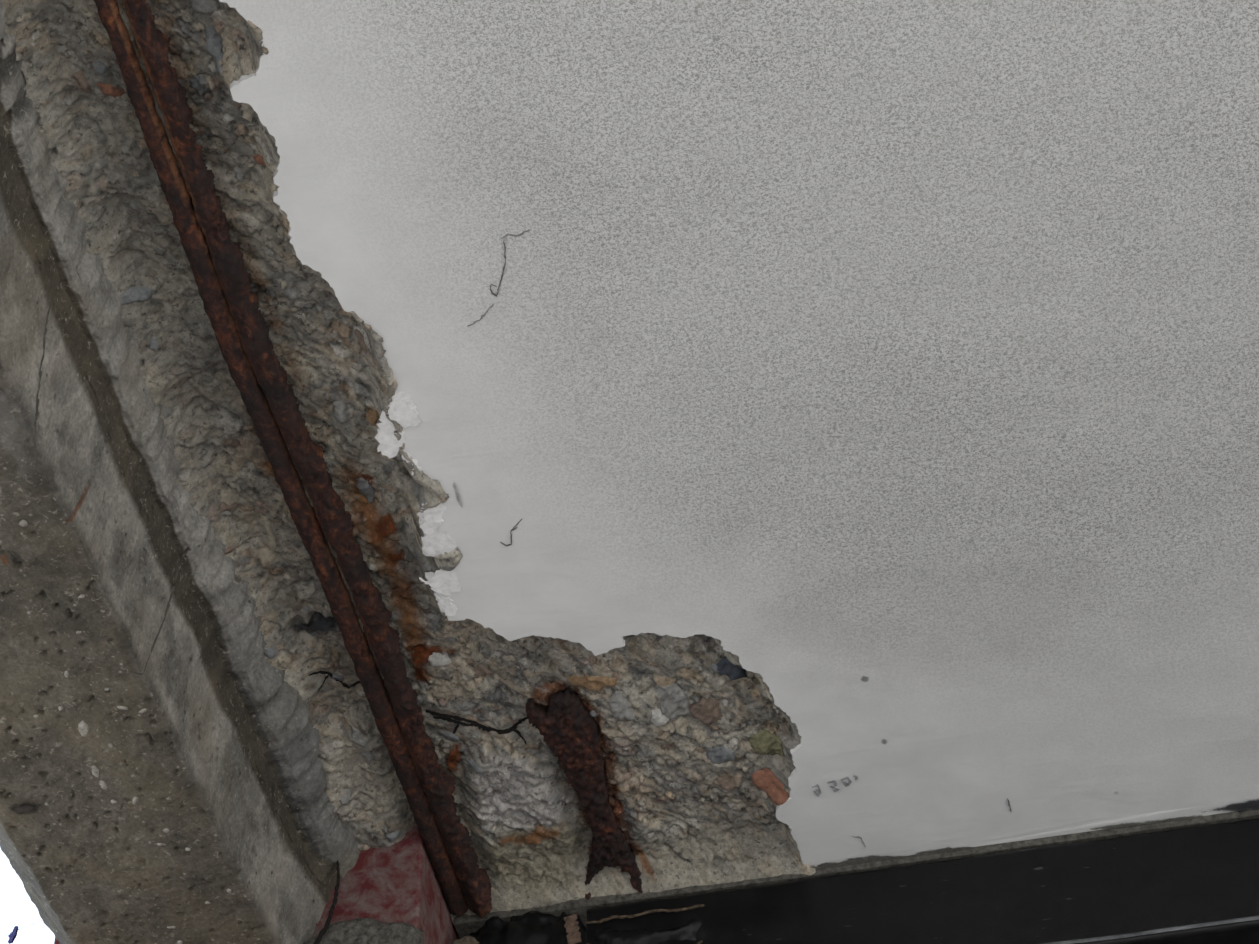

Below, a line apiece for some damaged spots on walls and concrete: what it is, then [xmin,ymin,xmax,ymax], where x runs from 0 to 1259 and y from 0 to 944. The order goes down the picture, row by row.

spalling [2,0,415,851]
corrosion [94,0,493,919]
crack [426,710,528,744]
spalling [145,0,975,925]
corrosion [526,680,653,900]
peeling [1091,815,1203,830]